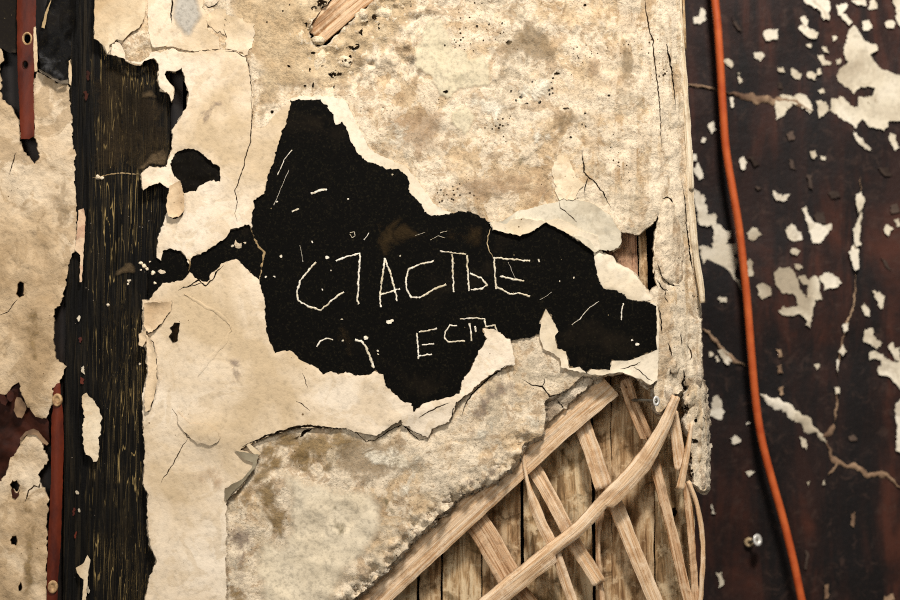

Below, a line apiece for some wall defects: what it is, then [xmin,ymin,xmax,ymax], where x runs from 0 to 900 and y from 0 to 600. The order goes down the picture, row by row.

crack [645,2,812,145]
peeling [763,29,778,41]
peeling [775,0,900,151]
crack [146,259,223,482]
crack [230,51,266,280]
peeling [93,0,725,600]
crack [582,155,611,207]
peeling [709,349,732,365]
peeling [693,154,842,327]
peeling [861,290,885,317]
peeling [863,328,900,390]
peeling [884,203,900,236]